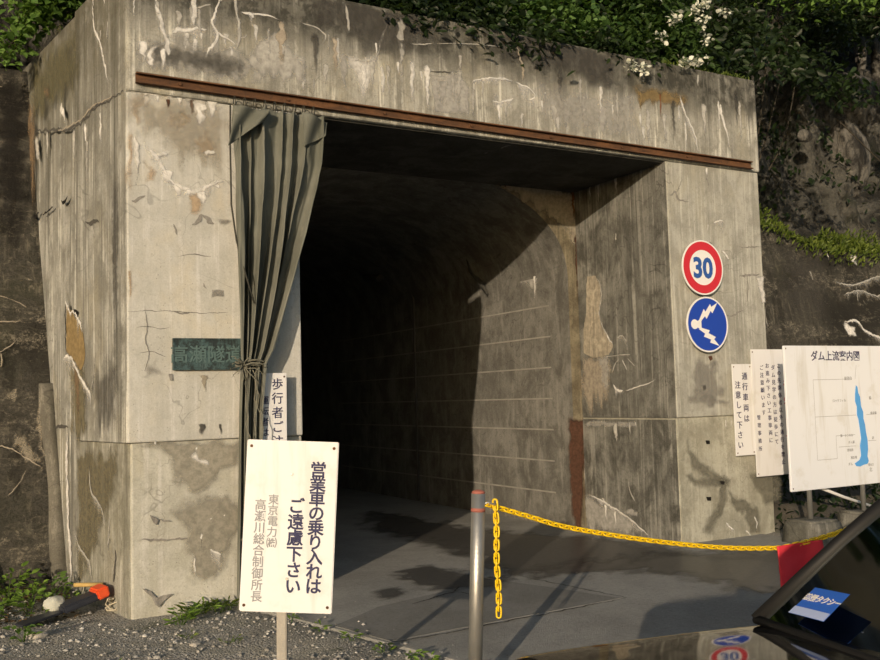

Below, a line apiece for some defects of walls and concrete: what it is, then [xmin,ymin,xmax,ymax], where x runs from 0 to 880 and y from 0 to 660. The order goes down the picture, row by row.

damp [0,36,78,202]
crack [35,90,123,178]
crack [34,196,68,219]
crack [85,219,99,234]
spalling [192,214,229,225]
spalling [65,301,85,370]
rust [568,418,585,527]
damp [688,452,759,536]
damp [752,474,780,503]
damp [365,511,471,556]
damp [484,481,781,593]
damp [377,566,470,598]